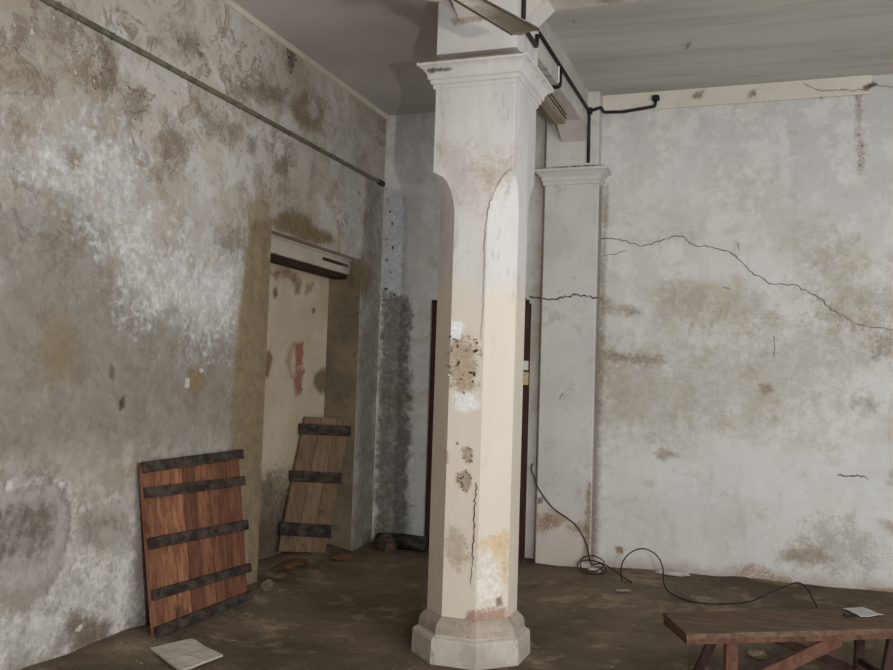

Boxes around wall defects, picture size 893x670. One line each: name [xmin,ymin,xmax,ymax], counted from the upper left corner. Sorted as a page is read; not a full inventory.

crack [803,82,893,103]
water stain [12,107,252,355]
water stain [273,213,332,243]
crack [529,292,598,300]
crack [601,235,892,331]
flaking render [295,342,305,395]
peeling [446,321,482,412]
spalling [457,447,473,492]
crack [470,483,478,577]